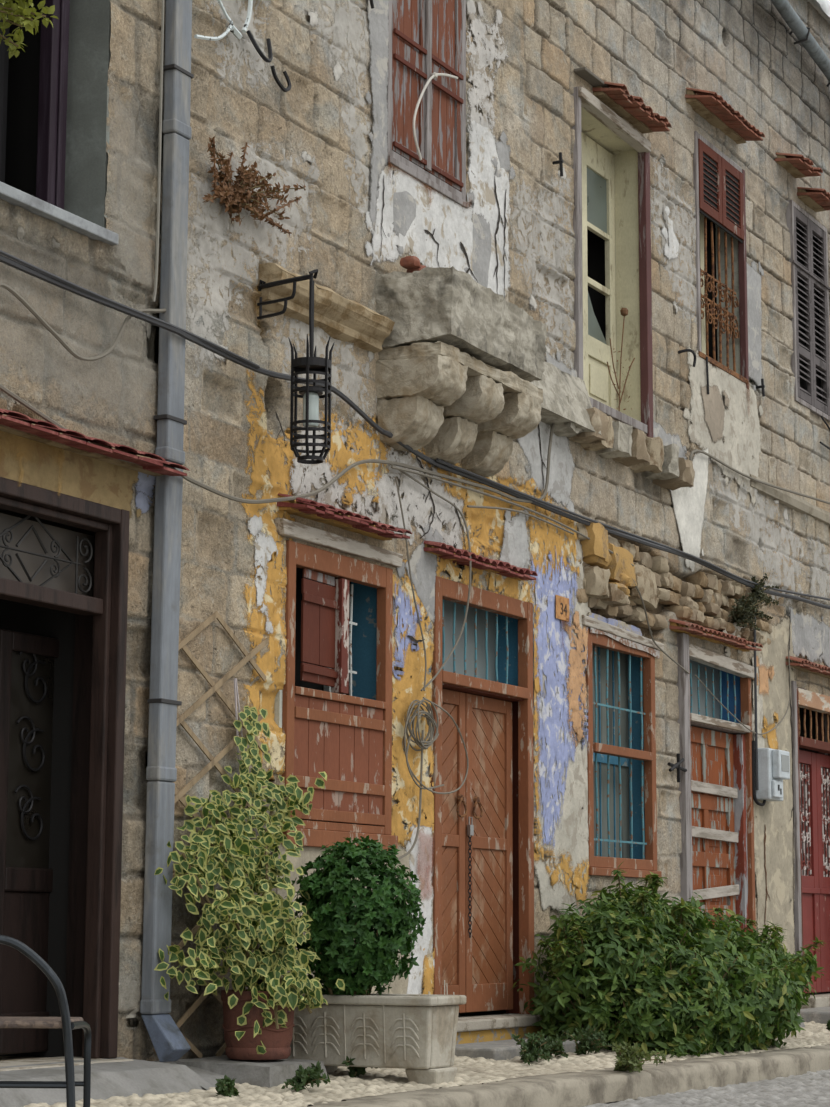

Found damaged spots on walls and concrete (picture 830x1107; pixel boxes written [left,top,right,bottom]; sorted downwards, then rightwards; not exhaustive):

peeling [205,0,279,100]
peeling [305,0,576,369]
crack [424,183,507,298]
peeling [240,316,660,995]